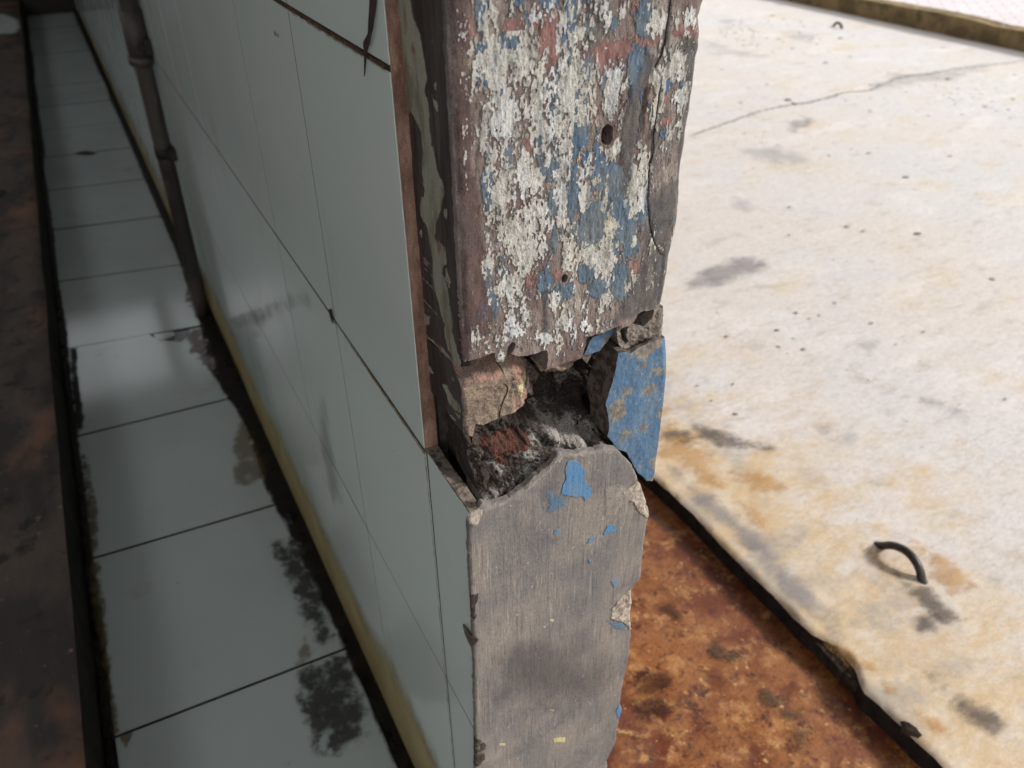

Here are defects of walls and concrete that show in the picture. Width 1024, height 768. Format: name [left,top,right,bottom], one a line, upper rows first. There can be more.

crack [647,0,671,254]
crack [690,61,1020,136]
peeling [398,0,698,526]
water stain [694,258,765,285]
water stain [74,6,435,768]
peeling [587,524,617,544]
spalling [610,578,633,629]
rust [635,673,673,719]